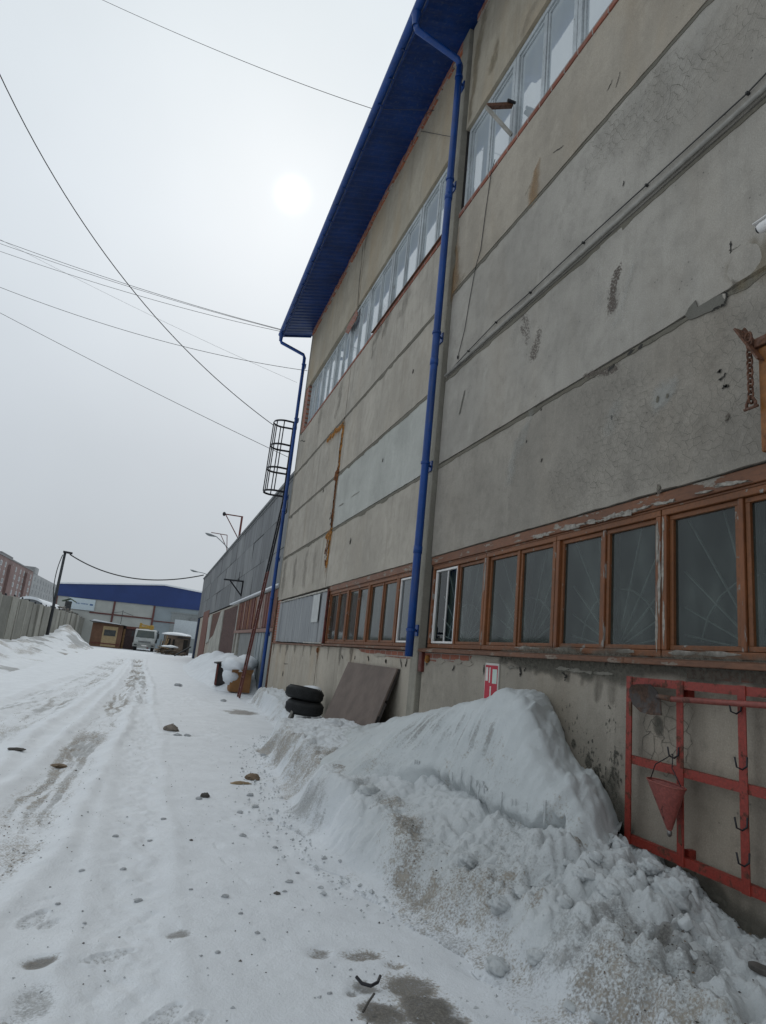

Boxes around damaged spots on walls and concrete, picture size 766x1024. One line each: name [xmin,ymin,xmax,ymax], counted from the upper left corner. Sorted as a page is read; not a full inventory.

crack [553,1,766,181]
spalling [607,263,622,314]
rust [324,421,344,568]
peeling [533,484,677,539]
peeling [695,480,752,494]
water stain [562,718,632,836]
water stain [695,877,766,940]